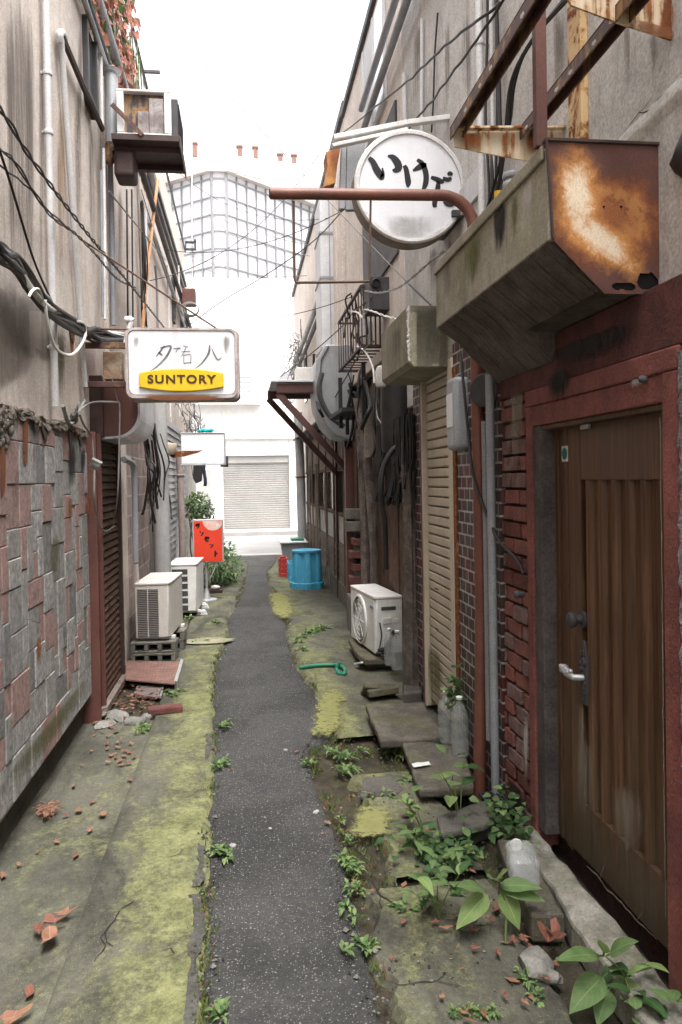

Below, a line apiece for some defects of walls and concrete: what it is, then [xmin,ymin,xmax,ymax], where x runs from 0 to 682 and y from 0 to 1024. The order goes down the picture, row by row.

rust [636,0,674,39]
crack [94,900,134,962]